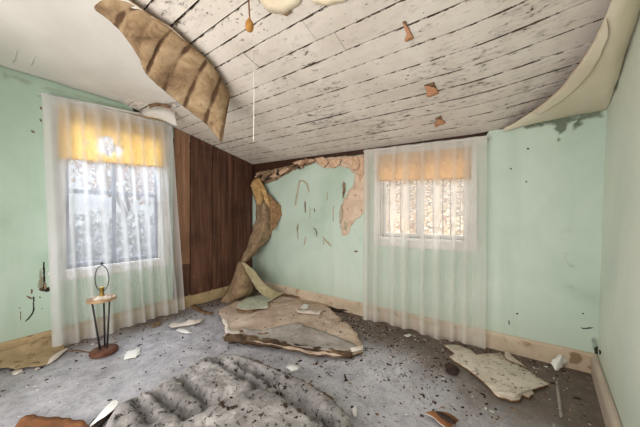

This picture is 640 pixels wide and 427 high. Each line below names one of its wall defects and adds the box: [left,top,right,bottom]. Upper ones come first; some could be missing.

peeling [403,21,414,42]
peeling [424,82,439,97]
peeling [132,102,177,126]
water stain [524,112,601,141]
spalling [255,155,369,236]